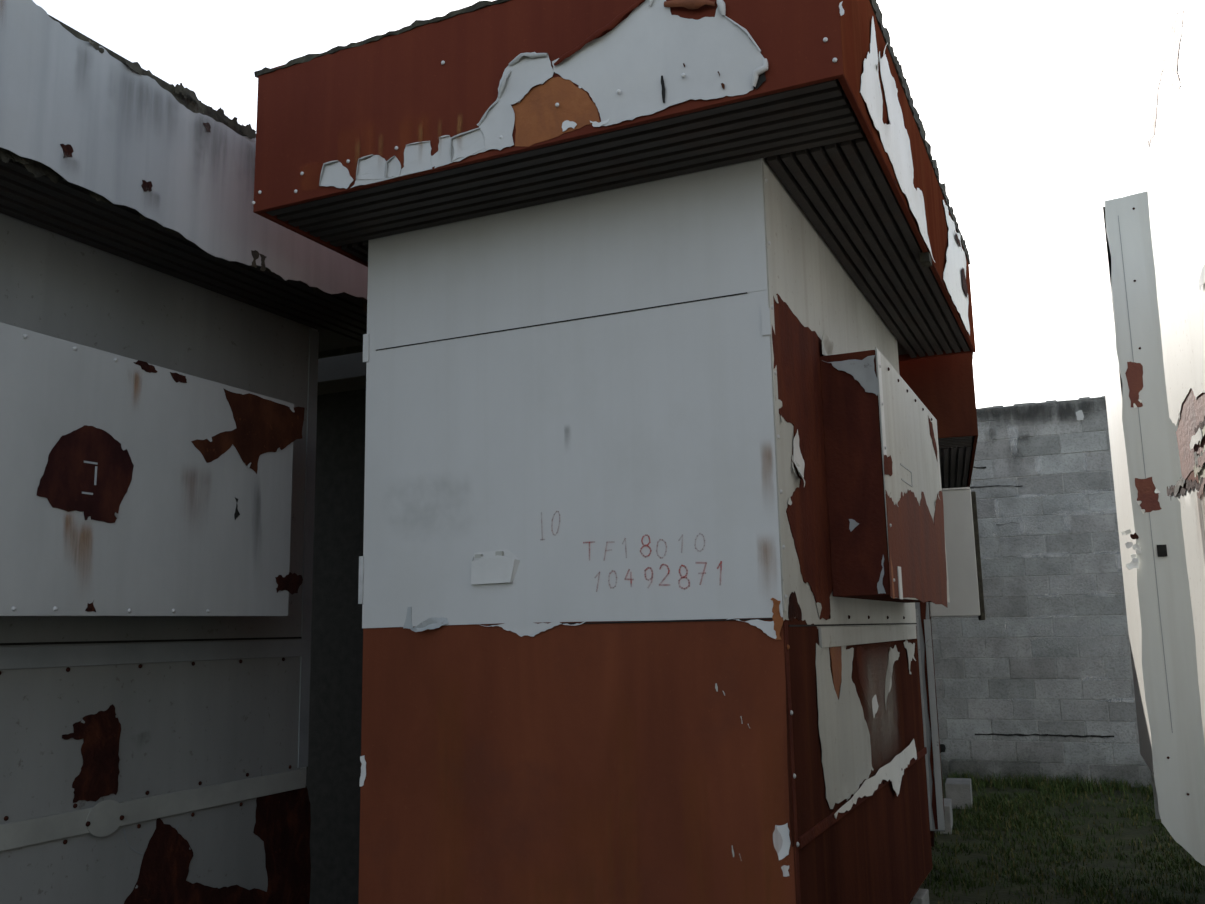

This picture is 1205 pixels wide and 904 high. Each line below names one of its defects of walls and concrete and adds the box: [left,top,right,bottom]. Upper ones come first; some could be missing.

peeling [319,0,768,189]
peeling [860,16,970,335]
peeling [822,330,879,395]
rust [37,425,134,543]
rust [191,388,305,474]
rust [1135,388,1205,514]
peeling [403,607,449,632]
peeling [481,619,586,637]
peeling [727,618,777,639]
rust [62,704,121,803]
peeling [815,640,917,818]
rust [124,787,311,904]